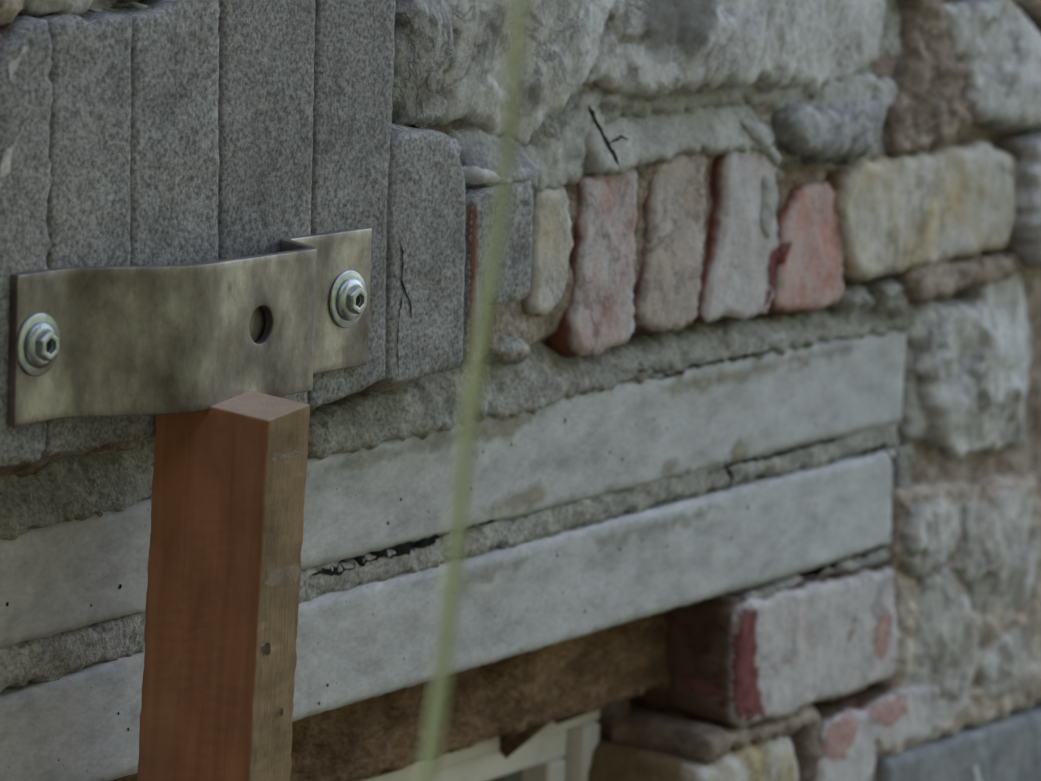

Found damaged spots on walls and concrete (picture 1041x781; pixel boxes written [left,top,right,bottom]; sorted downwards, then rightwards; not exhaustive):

crack [589,106,628,166]